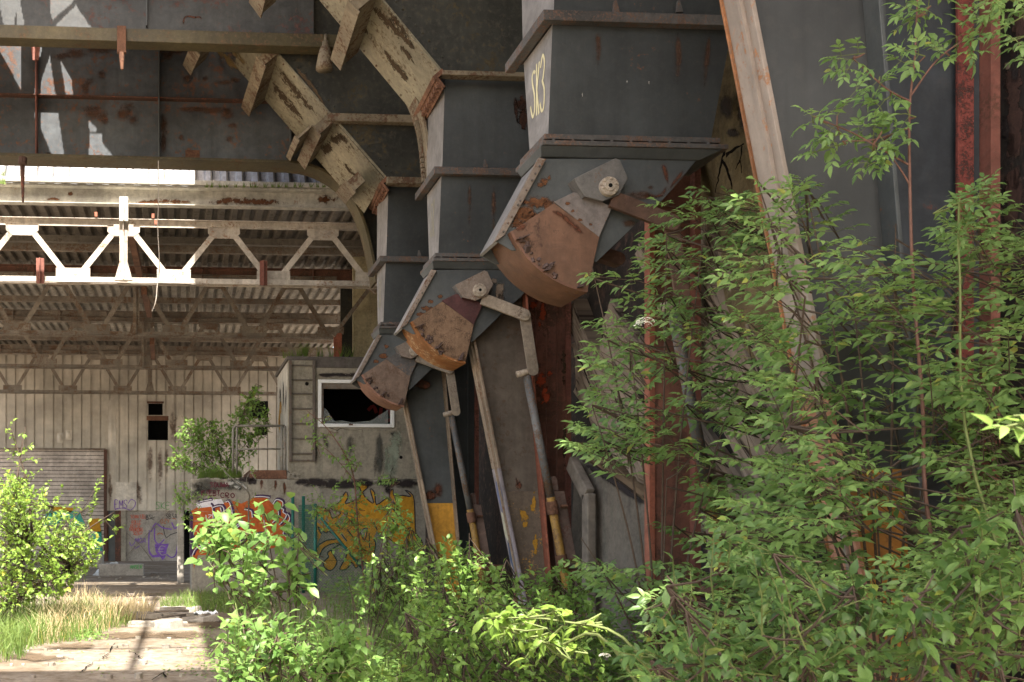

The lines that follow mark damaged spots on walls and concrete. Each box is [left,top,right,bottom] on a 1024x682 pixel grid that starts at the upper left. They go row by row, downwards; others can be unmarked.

peeling [373,7,414,82]
peeling [273,67,325,119]
peeling [321,133,353,154]
crack [715,143,744,193]
corrosion [209,197,284,205]
corrosion [510,175,592,233]